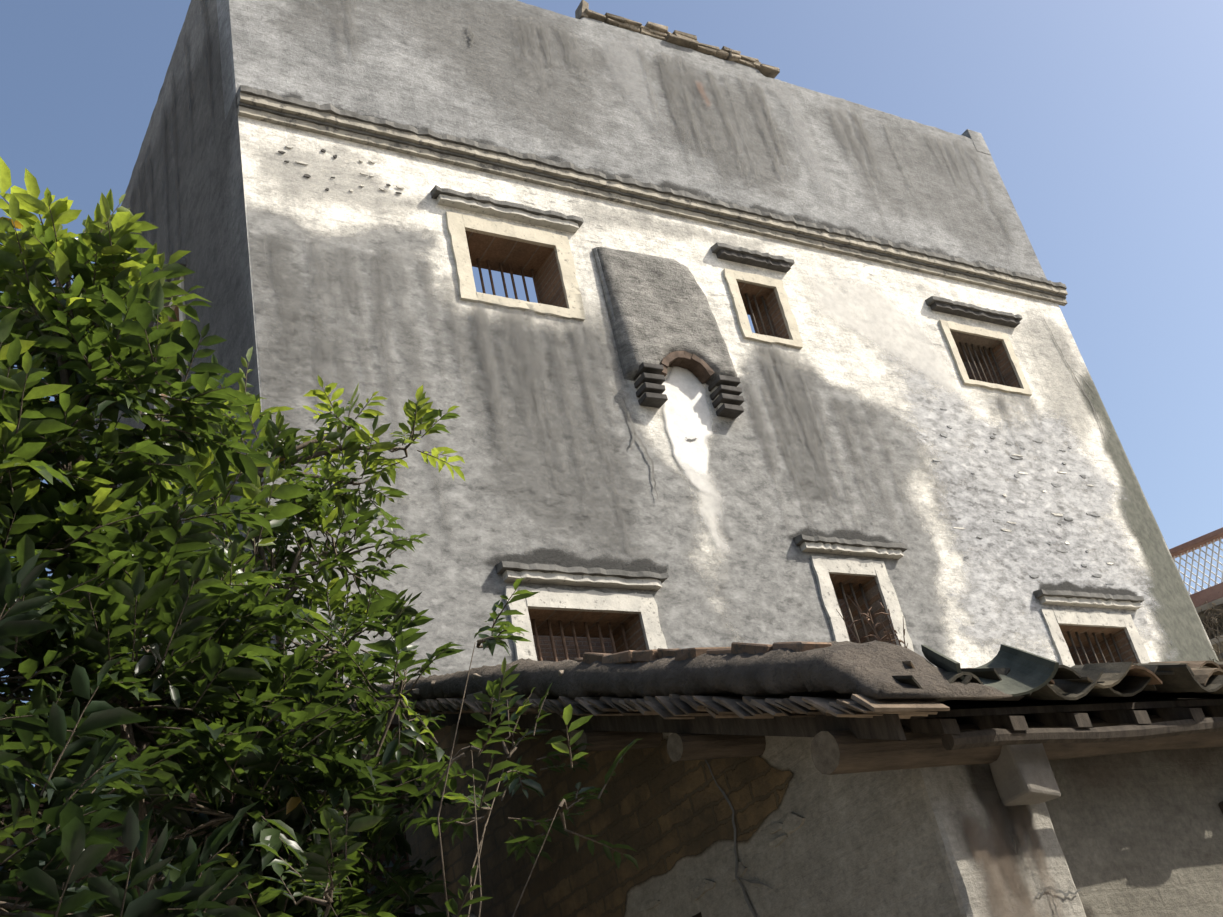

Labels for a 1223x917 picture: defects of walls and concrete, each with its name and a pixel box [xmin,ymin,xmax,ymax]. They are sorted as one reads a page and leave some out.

damp [656,181,960,258]
damp [247,206,957,685]
spalling [662,366,725,547]
damp [1039,581,1137,596]
spalling [337,725,805,917]